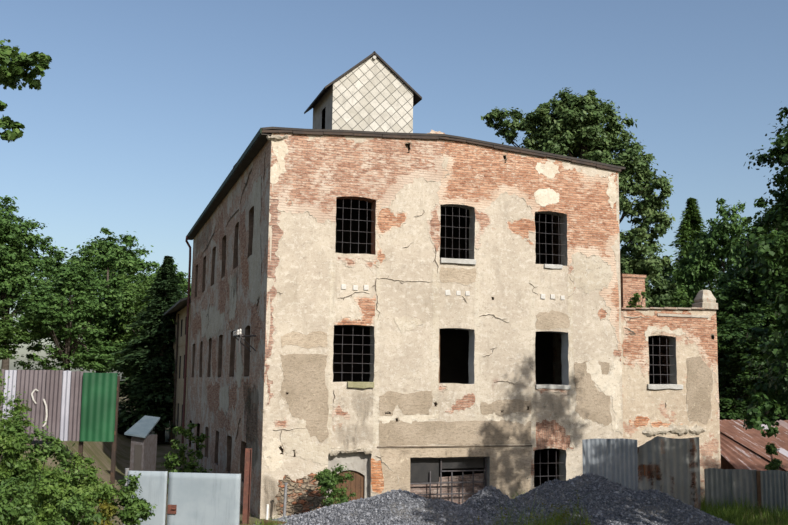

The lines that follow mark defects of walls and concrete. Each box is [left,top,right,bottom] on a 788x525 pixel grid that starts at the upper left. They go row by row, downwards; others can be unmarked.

crack [339,246,439,320]
flaking render [191,129,720,517]
corrosion [638,465,661,484]